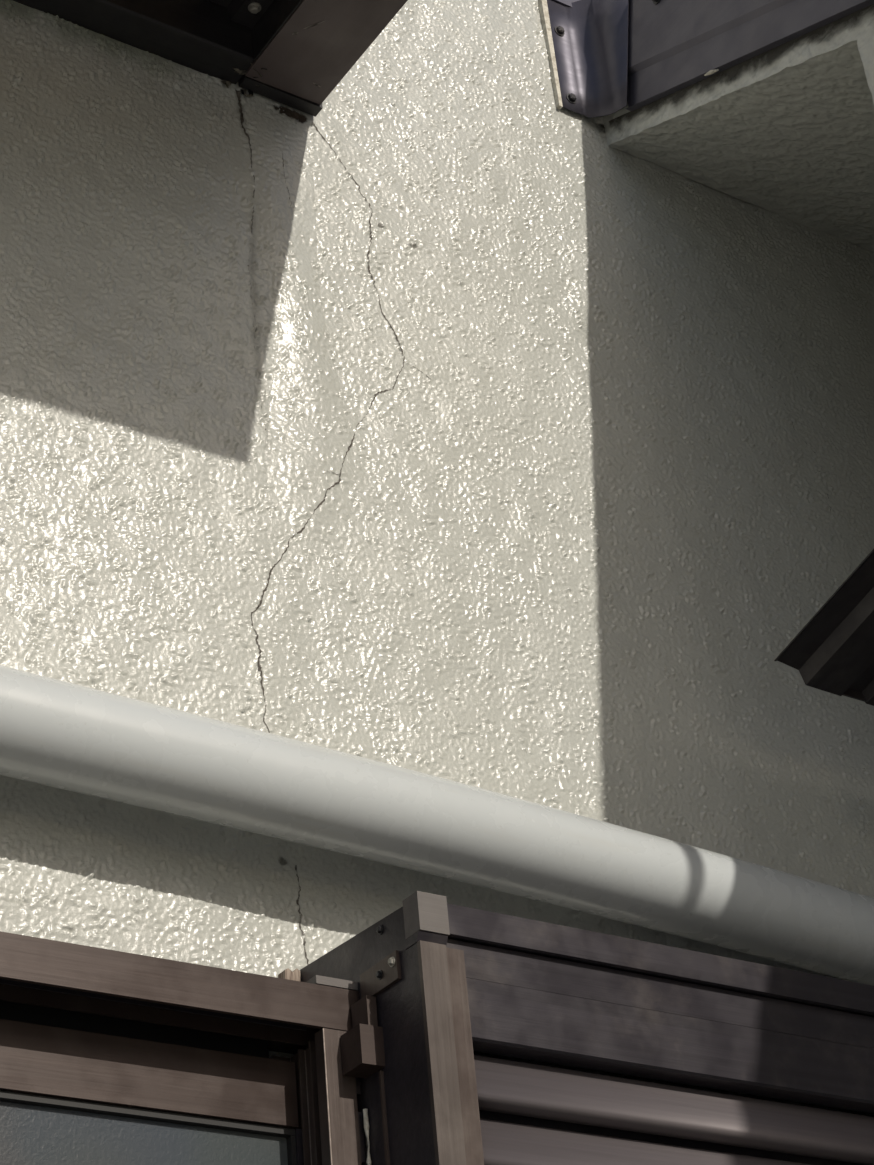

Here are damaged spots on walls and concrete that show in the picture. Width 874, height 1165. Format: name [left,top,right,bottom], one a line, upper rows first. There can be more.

crack [236,90,255,233]
crack [251,122,429,733]
crack [295,865,309,965]